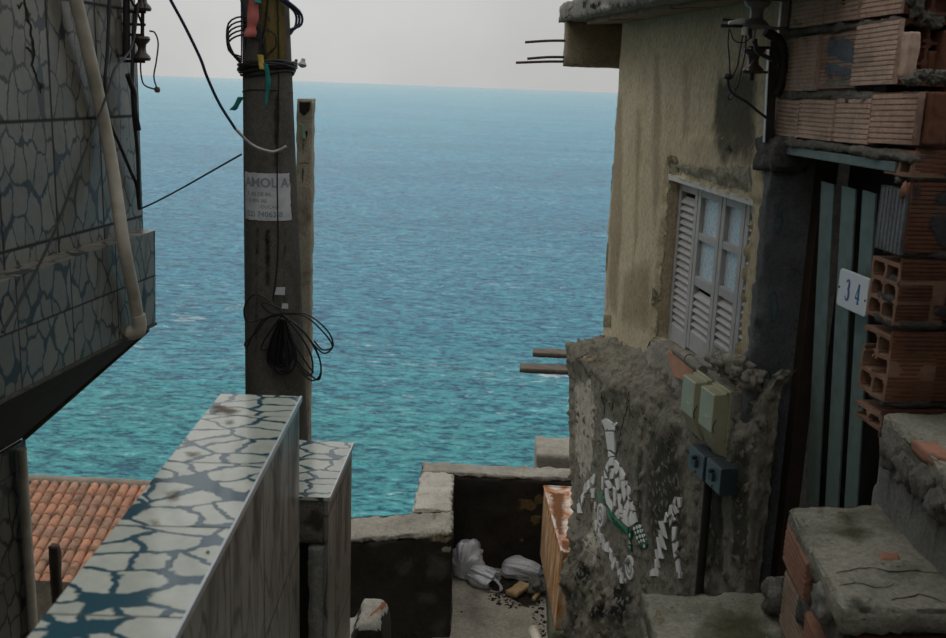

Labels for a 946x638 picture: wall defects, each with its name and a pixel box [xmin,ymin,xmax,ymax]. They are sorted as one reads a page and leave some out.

crack [17,0,44,93]
crack [836,567,944,602]